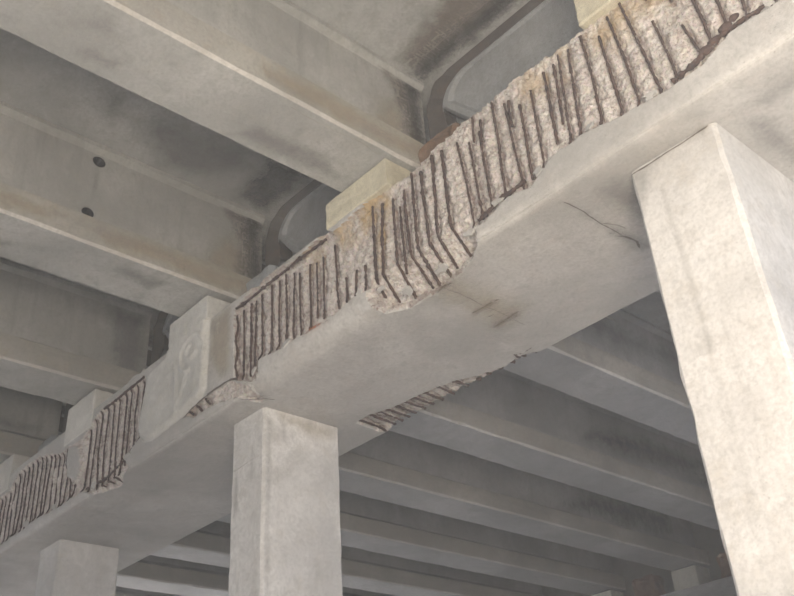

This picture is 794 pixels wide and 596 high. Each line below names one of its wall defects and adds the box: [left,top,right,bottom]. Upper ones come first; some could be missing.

corrosion [408,0,512,78]
spalling [187,0,779,418]
crack [564,202,640,248]
spalling [359,346,537,432]
spalling [0,376,146,545]